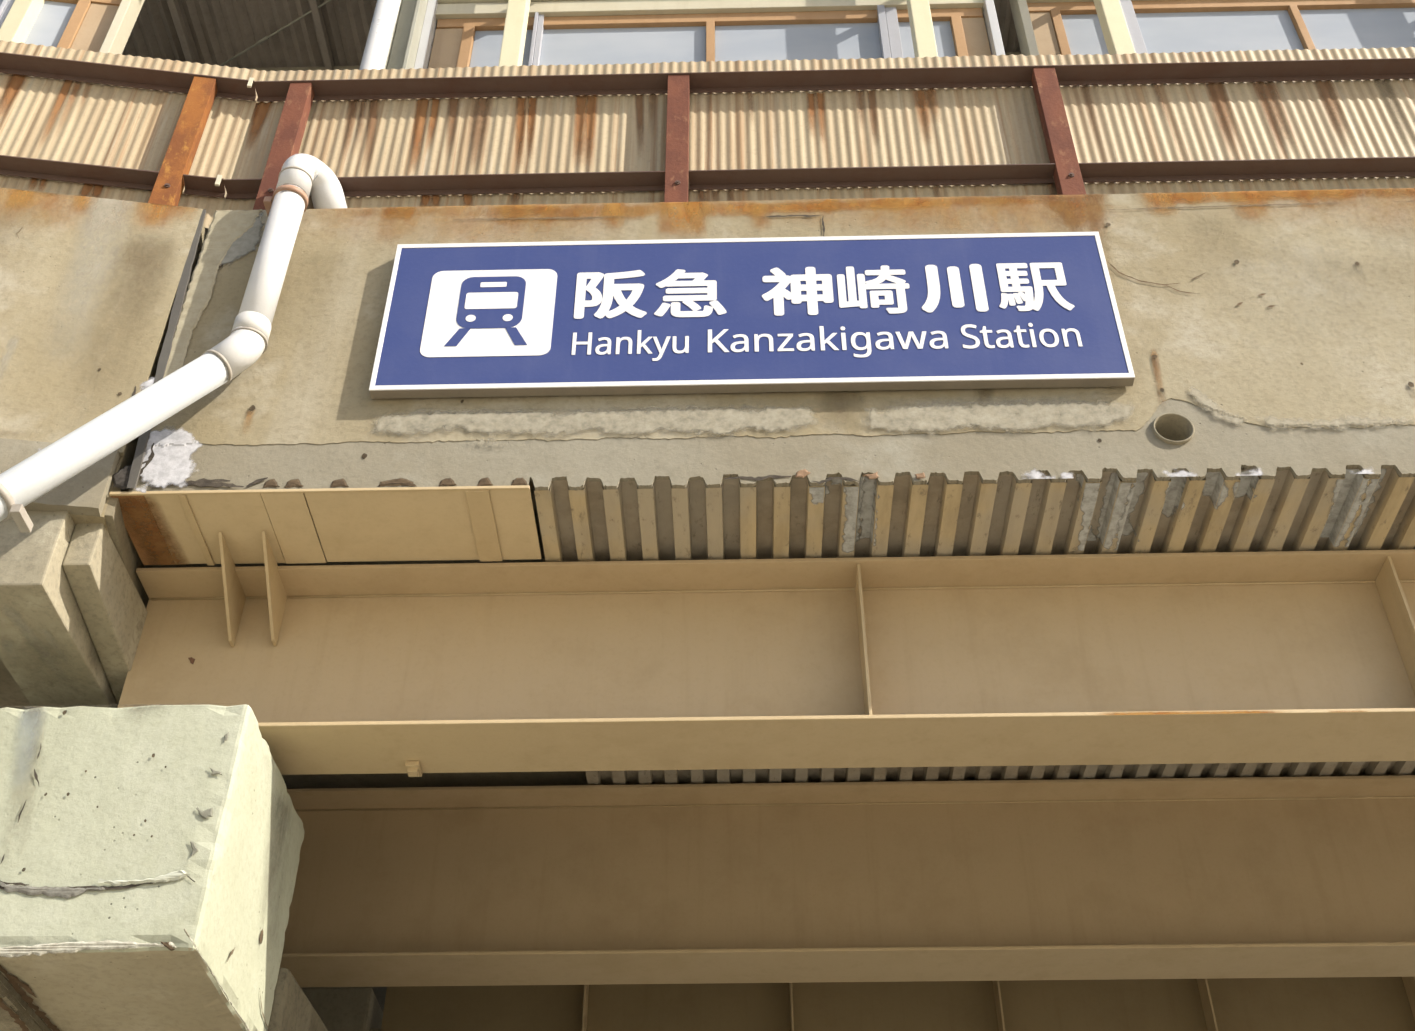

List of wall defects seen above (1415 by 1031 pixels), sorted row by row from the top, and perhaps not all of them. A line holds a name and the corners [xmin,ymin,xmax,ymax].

rust [413,98,490,159]
rust [517,97,537,153]
rust [575,95,597,156]
rust [1207,83,1231,133]
rust [1315,80,1341,126]
rust [659,179,1099,230]
rust [1146,188,1415,209]
peeling [1097,472,1148,550]
peeling [1202,471,1259,509]
crack [18,743,41,822]
crack [0,854,29,890]
crack [68,876,195,890]